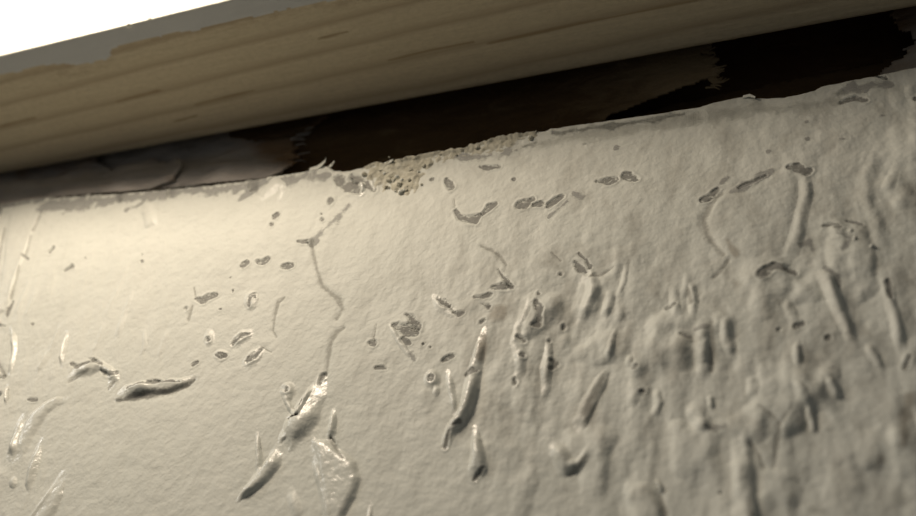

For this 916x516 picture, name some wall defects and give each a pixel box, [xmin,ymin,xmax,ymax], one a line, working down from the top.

flaking render [334,130,538,196]
peeling [595,171,638,185]
peeling [786,162,813,176]
peeling [258,176,287,226]
crack [309,204,349,247]
peeling [454,201,498,224]
peeling [516,191,584,218]
peeling [473,270,514,309]
peeling [562,252,602,330]
peeling [203,328,266,371]
peeling [388,313,431,361]
peeling [509,291,558,408]